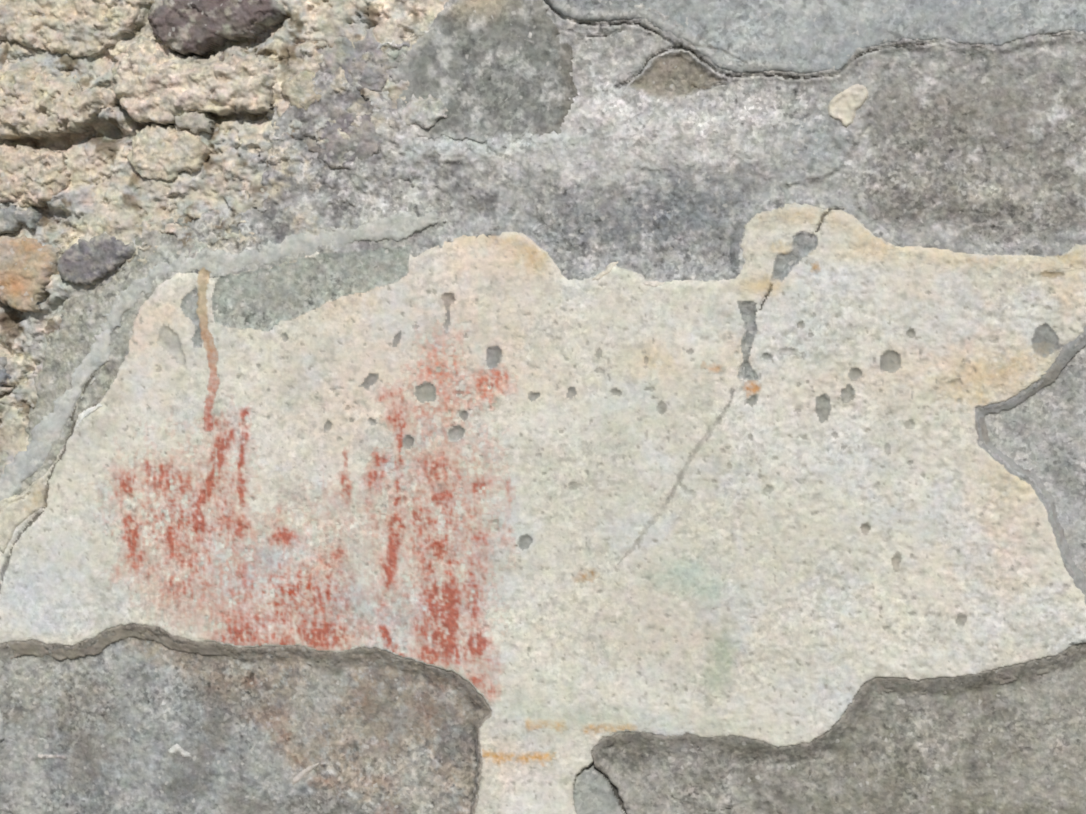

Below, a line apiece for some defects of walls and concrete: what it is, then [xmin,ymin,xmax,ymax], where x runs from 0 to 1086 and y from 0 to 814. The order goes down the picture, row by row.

crack [815,208,844,232]
spalling [211,245,413,342]
rust [196,267,220,431]
flaking render [74,403,102,429]
spalling [644,387,667,415]
peeling [87,285,540,705]
crack [617,389,735,565]
rust [204,667,265,694]
rust [397,672,467,741]
rust [240,700,404,814]